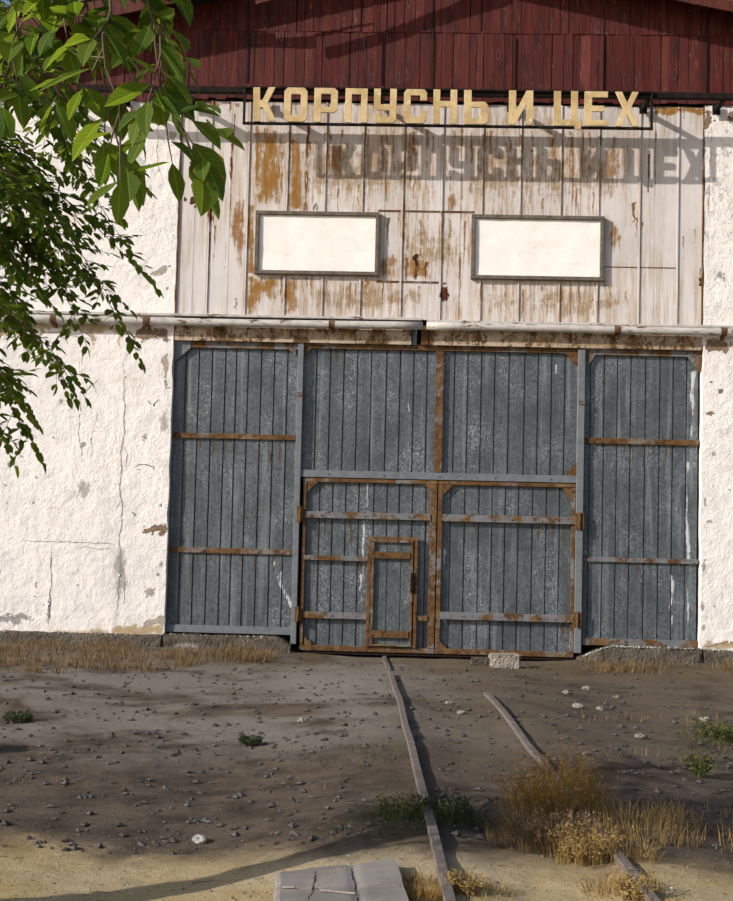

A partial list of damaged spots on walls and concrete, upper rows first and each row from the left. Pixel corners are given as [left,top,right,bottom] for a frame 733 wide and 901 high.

rust [195,100,239,180]
spalling [703,110,733,134]
rust [207,209,216,260]
rust [225,126,626,317]
spalling [135,325,170,342]
spalling [705,338,729,354]
spalling [160,353,169,389]
crack [18,352,154,626]
spalling [142,522,168,537]
peeling [0,603,34,626]